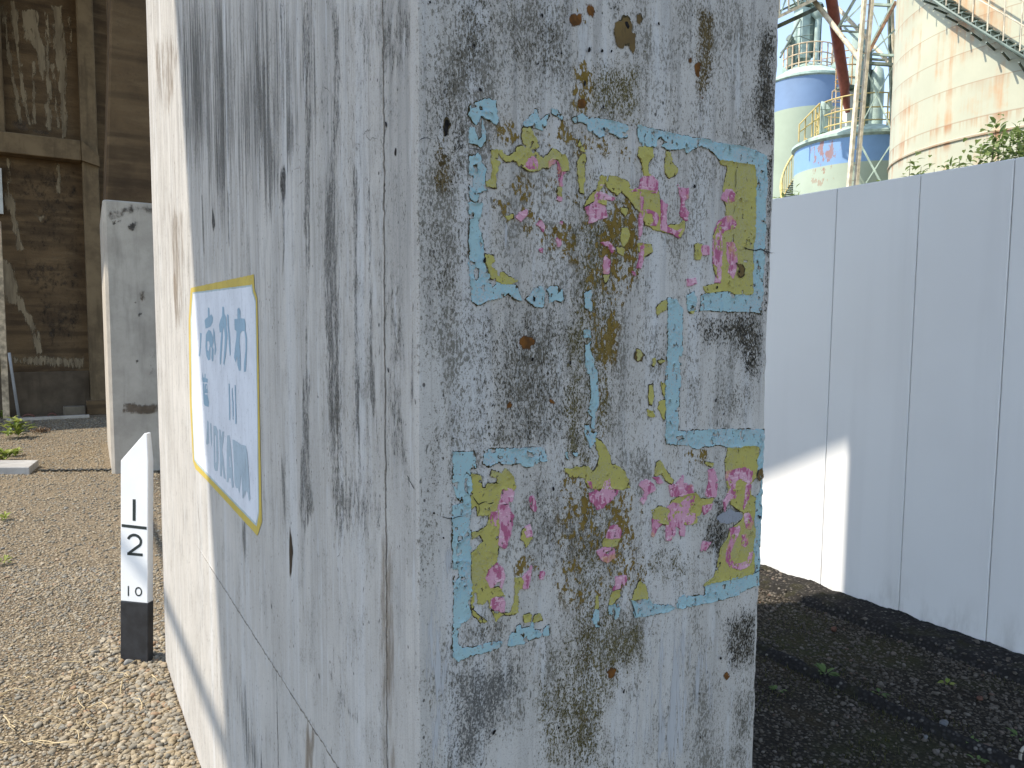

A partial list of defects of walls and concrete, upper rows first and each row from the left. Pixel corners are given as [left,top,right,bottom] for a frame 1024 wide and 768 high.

rust [569,4,595,27]
rust [572,59,595,114]
leakage [694,7,718,101]
peeling [467,87,769,628]
peeling [443,446,550,662]